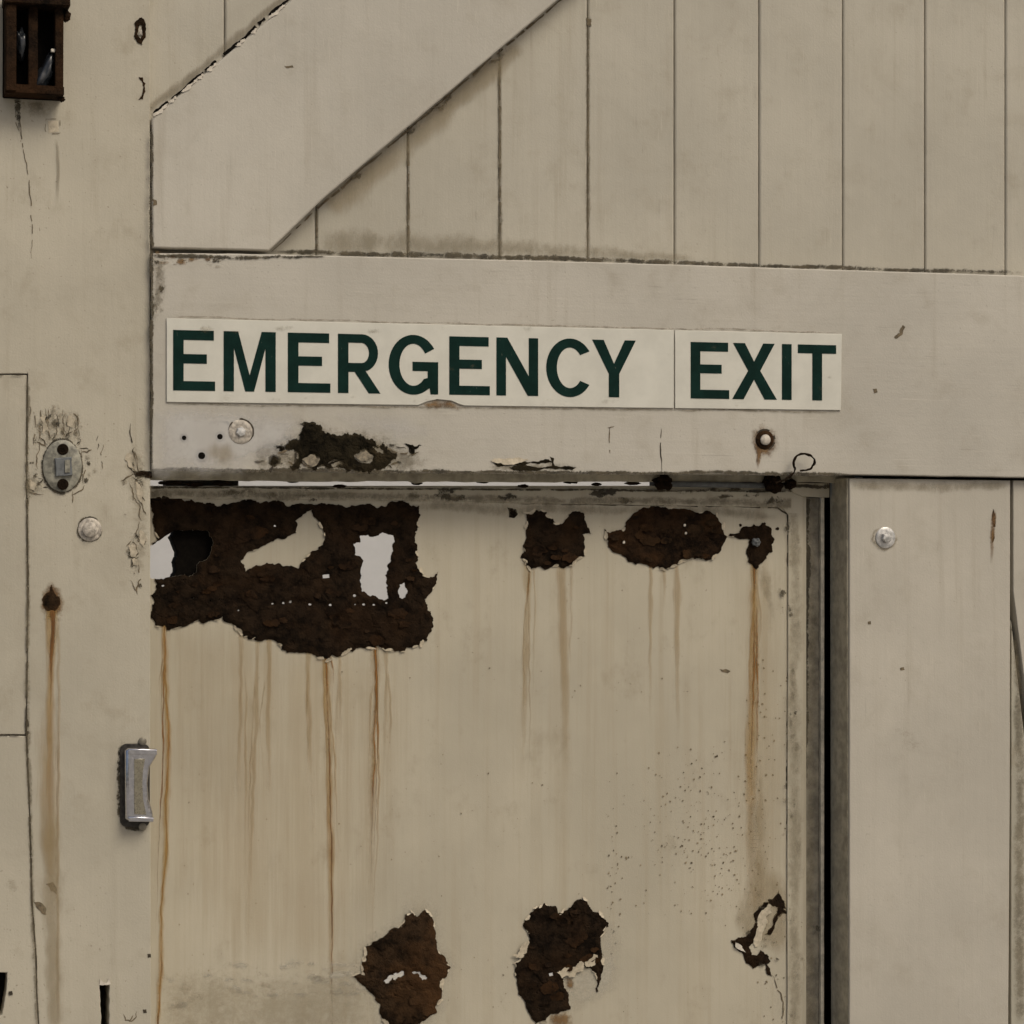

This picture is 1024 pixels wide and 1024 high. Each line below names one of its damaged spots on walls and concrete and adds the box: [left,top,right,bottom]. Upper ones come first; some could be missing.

rust [754,429,776,463]
rust [42,585,62,672]
rust [604,506,779,734]
rust [150,496,438,936]
peeling [731,891,787,1019]